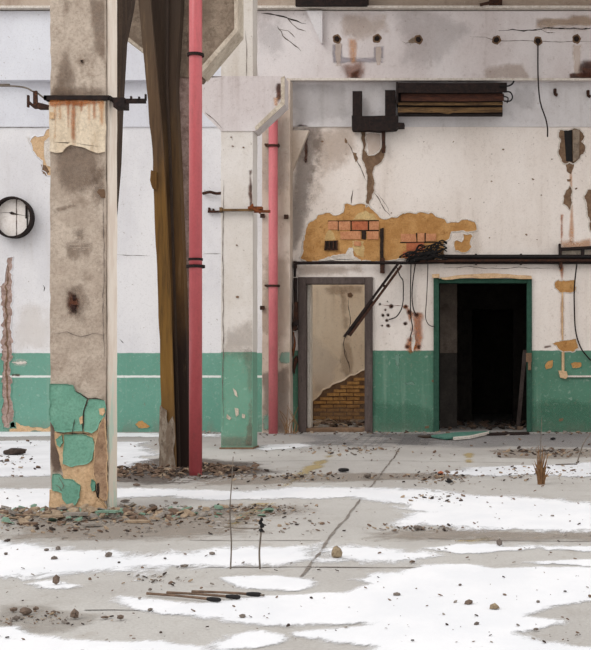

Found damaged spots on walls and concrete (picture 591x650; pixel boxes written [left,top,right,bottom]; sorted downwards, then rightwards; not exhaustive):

crack [263,13,306,51]
peeling [29,101,107,177]
rust [50,100,103,138]
flaking render [551,127,586,211]
flaking render [299,132,479,261]
rust [67,292,78,312]
flaking render [554,279,577,294]
rust [403,305,422,352]
flaking render [552,338,579,353]
flaking render [313,368,365,421]
peeling [8,384,109,512]